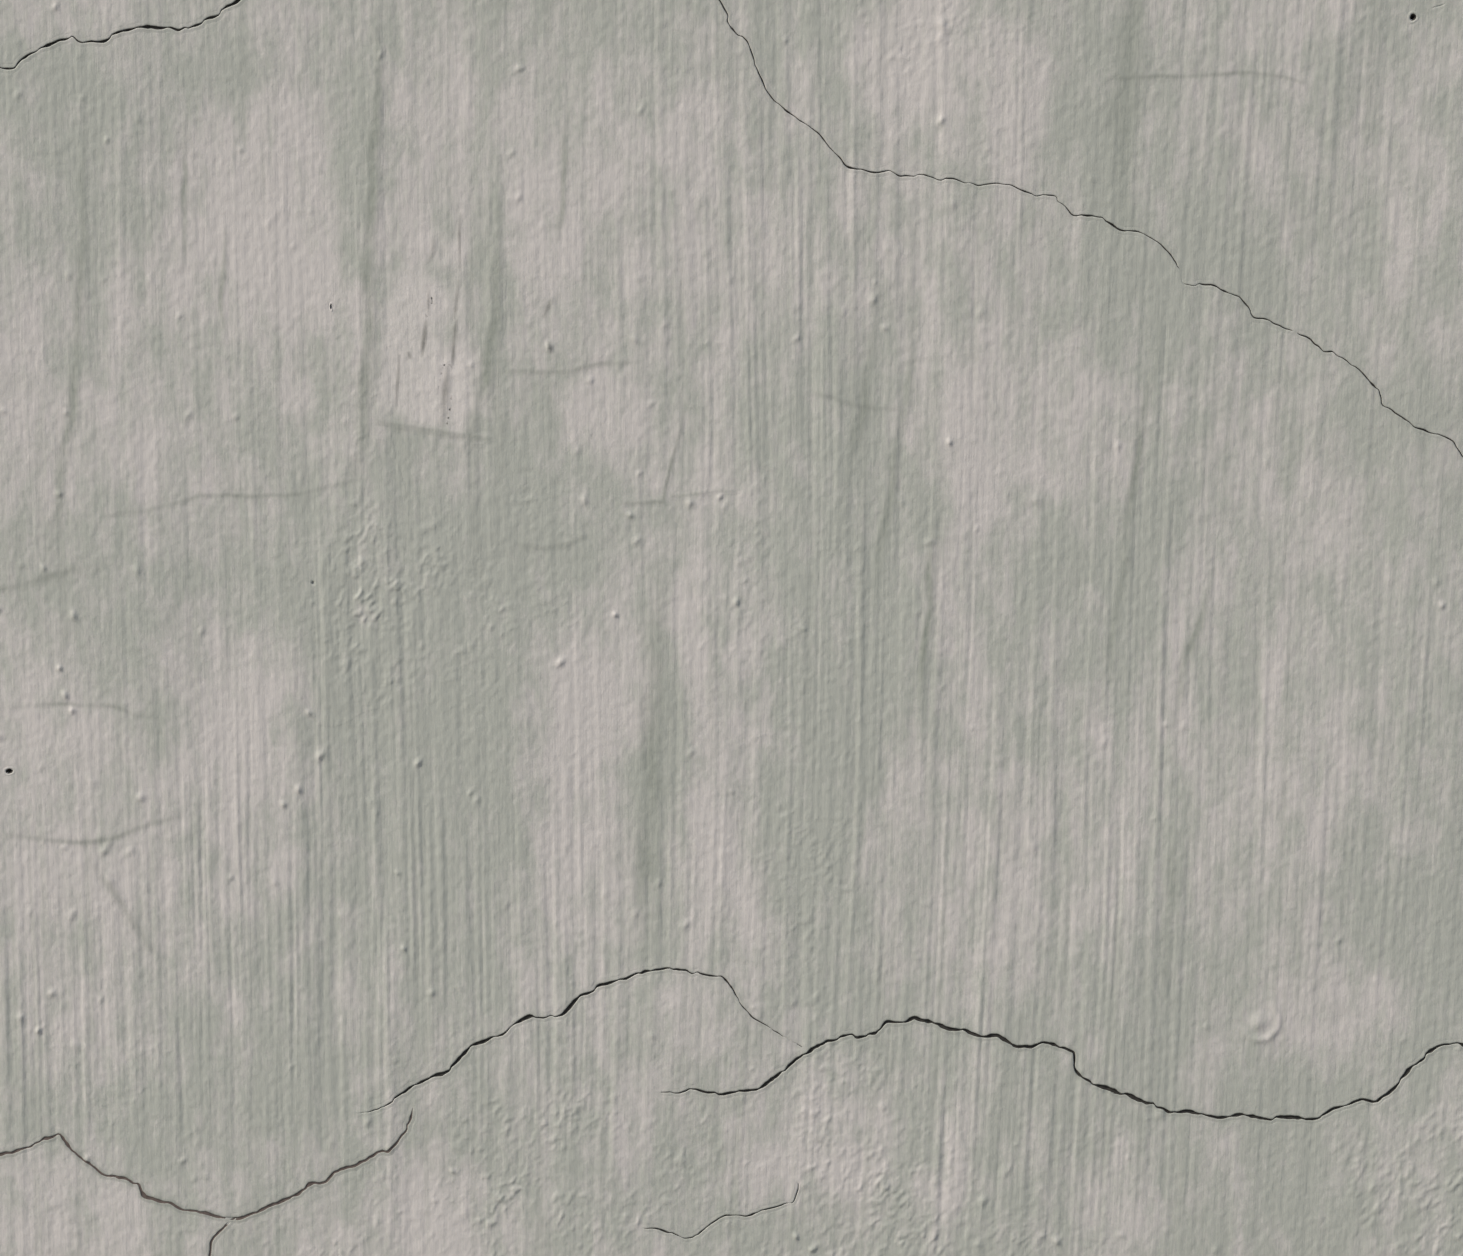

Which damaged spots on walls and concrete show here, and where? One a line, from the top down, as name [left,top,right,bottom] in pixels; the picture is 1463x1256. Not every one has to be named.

crack [0,0,248,74]
crack [714,0,1463,462]
crack [503,357,644,378]
crack [375,416,497,444]
crack [615,401,689,507]
crack [0,964,1463,1256]